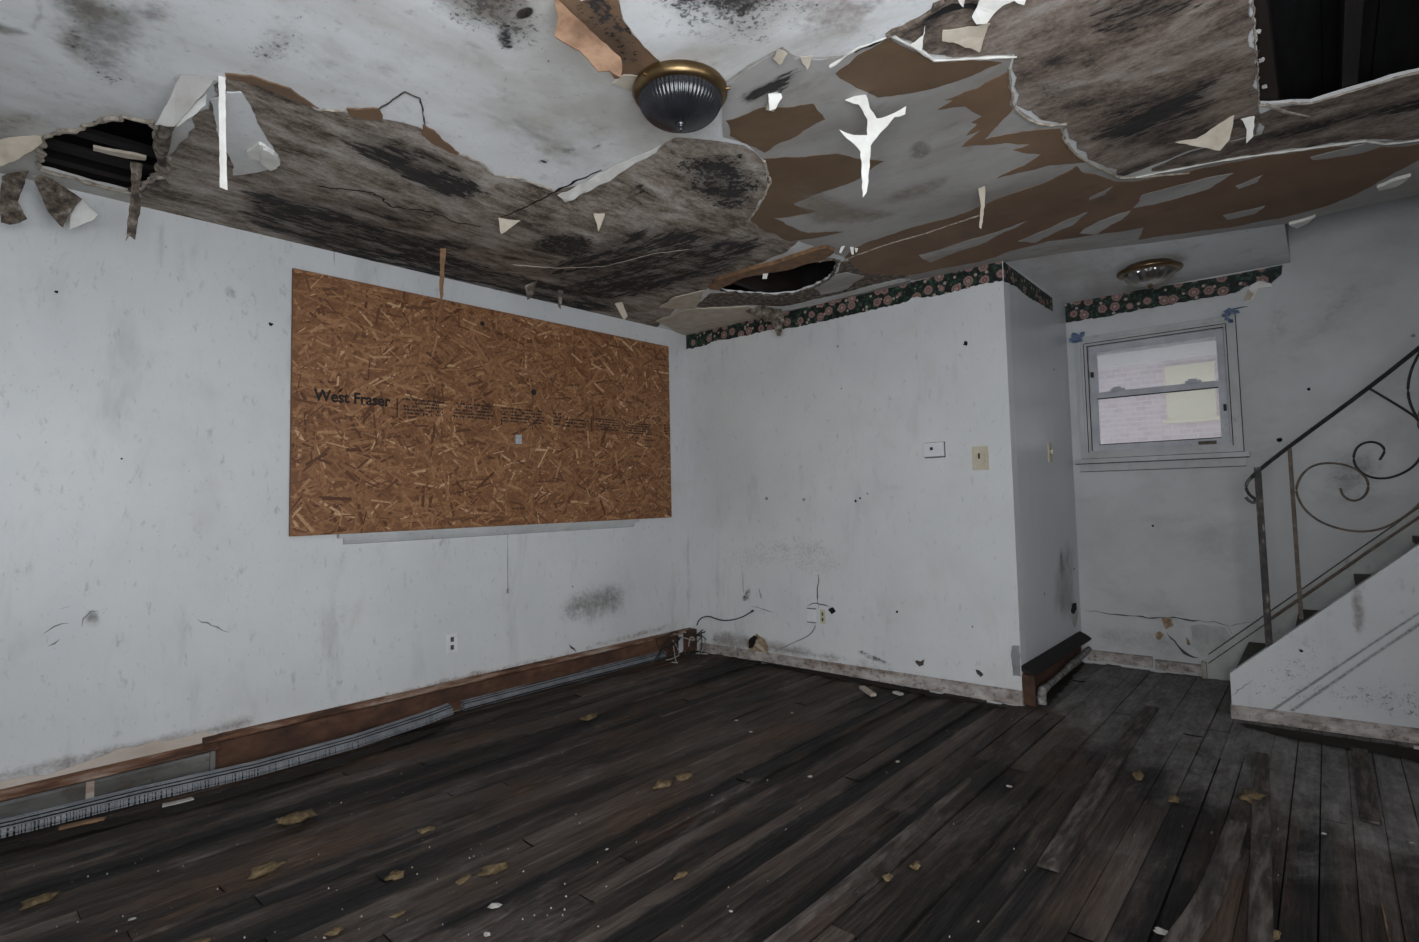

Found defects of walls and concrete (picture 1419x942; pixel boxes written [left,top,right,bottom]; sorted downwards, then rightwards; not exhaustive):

mould [445,0,536,49]
peeling [555,0,659,92]
mould [663,0,818,41]
leakage [896,0,1419,176]
peeling [709,0,1419,291]
leakage [140,80,798,327]
peeling [1244,281,1273,303]